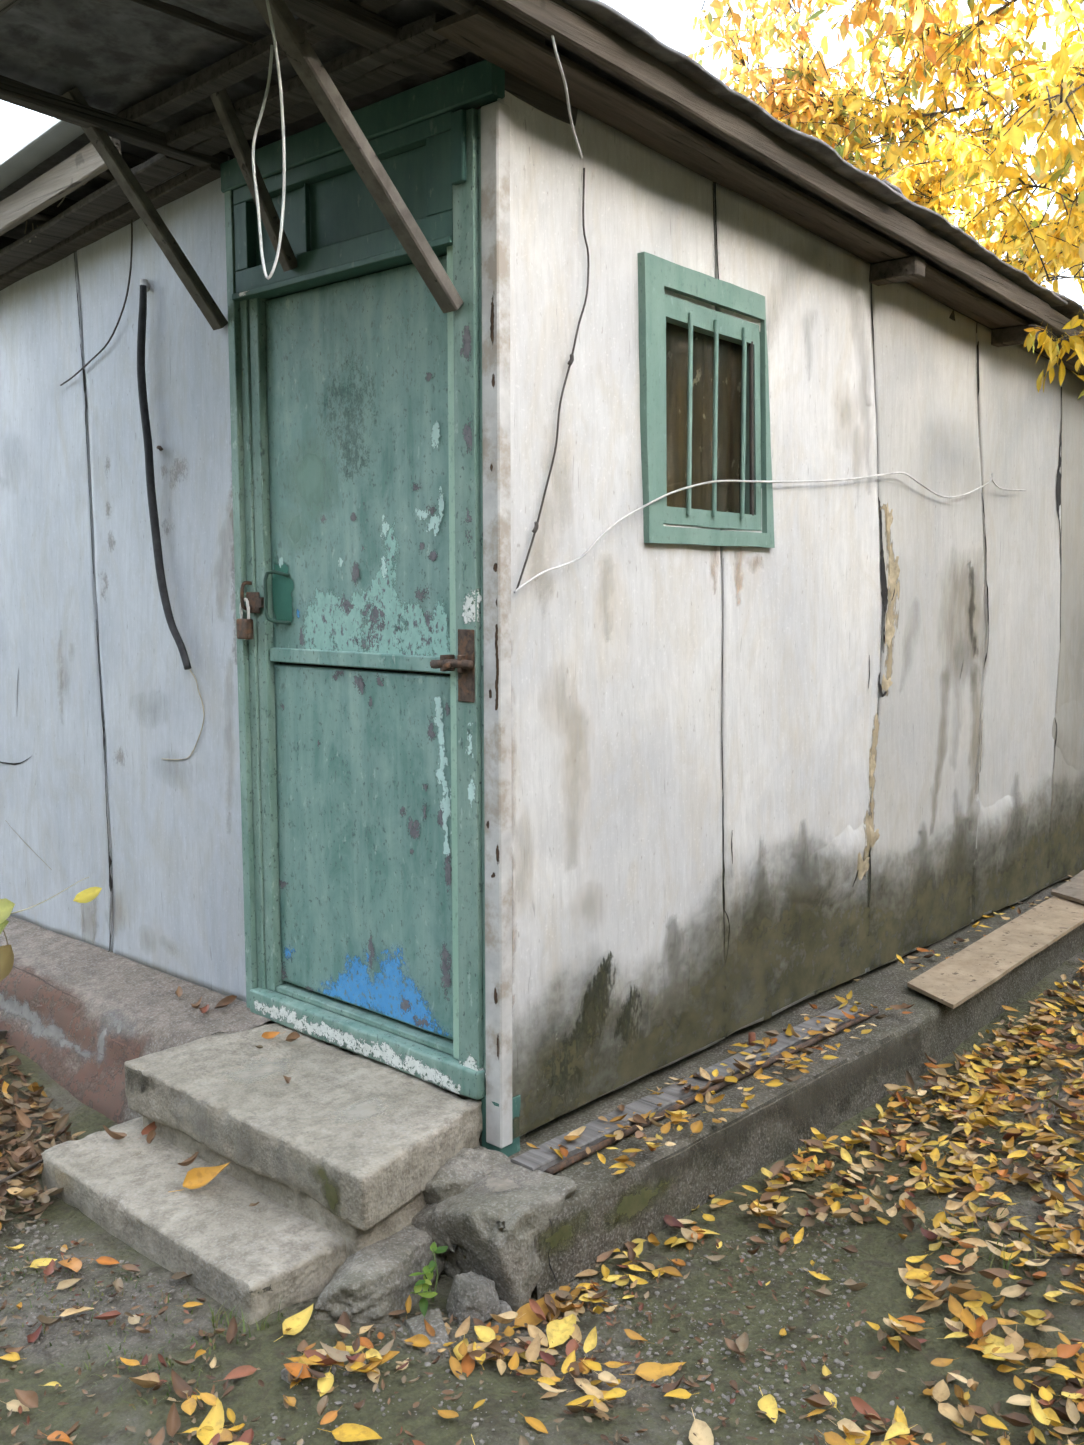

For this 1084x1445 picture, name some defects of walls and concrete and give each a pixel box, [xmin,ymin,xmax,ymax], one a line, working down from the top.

peeling [460,326,471,362]
crack [974,341,982,425]
peeling [297,515,499,710]
peeling [415,486,444,562]
crack [868,497,895,697]
crack [960,496,989,678]
crack [1055,387,1063,643]
peeling [400,695,476,893]
crack [853,812,872,886]
peeling [254,1000,486,1094]
peeling [305,935,452,1036]
water stain [512,796,1084,1139]